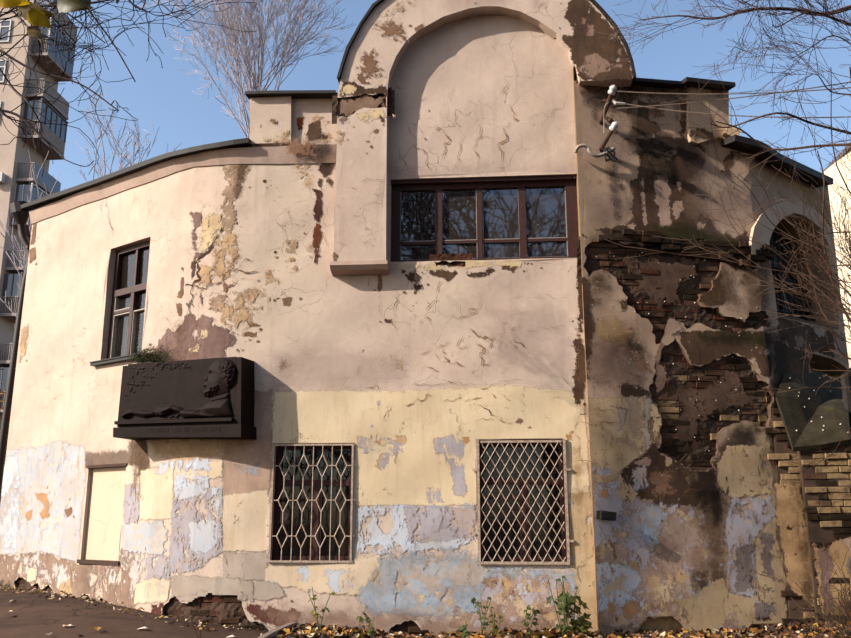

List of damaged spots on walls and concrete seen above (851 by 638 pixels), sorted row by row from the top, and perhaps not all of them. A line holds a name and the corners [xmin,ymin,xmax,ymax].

crack [398,34,562,170]
flaking render [554,0,632,84]
leakage [581,85,741,242]
crack [185,213,257,314]
flaking render [149,164,302,361]
peeling [348,425,407,470]
peeling [433,430,471,507]
crack [405,278,646,495]
flaking render [572,97,849,629]
flaking render [0,444,300,631]
peeling [390,547,471,610]
flaking render [627,616,683,634]